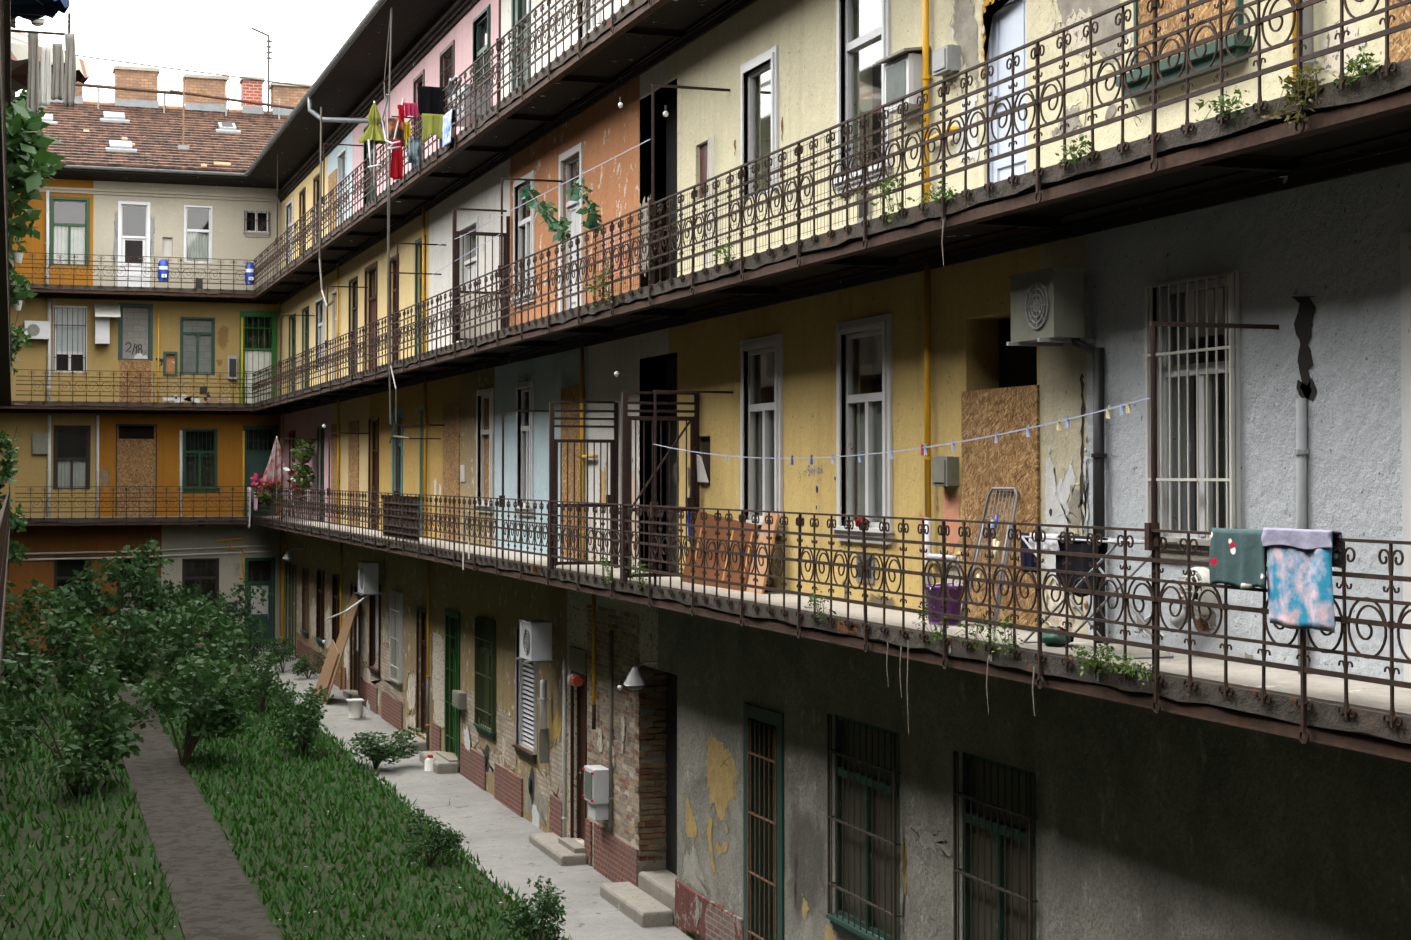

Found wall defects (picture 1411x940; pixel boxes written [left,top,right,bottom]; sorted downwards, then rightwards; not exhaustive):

peeling [680,732,739,940]
peeling [825,924,836,940]